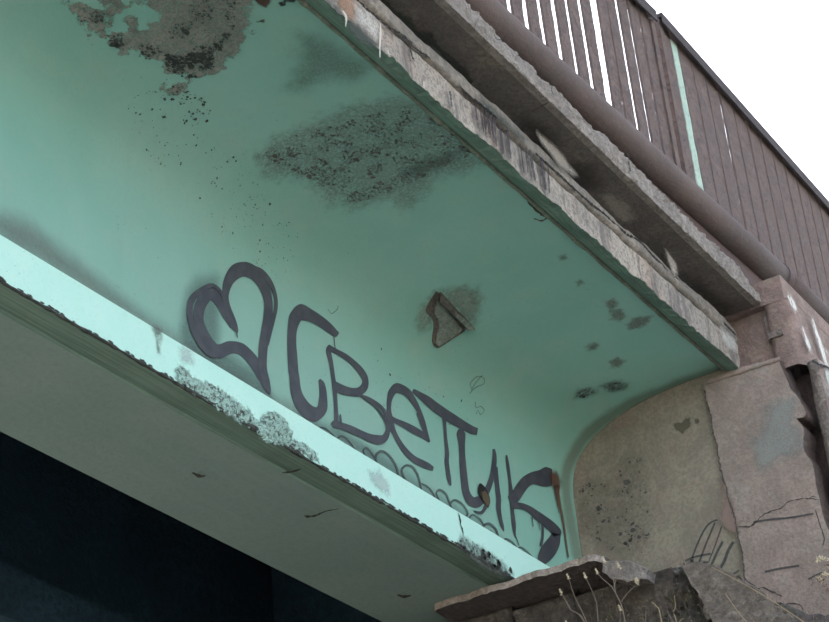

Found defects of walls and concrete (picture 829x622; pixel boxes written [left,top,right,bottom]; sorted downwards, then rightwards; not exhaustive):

peeling [61,0,256,124]
damp [474,100,550,193]
spalling [0,276,224,412]
spalling [420,287,478,348]
spalling [281,444,515,580]
rust [551,471,569,558]
crack [704,390,825,609]